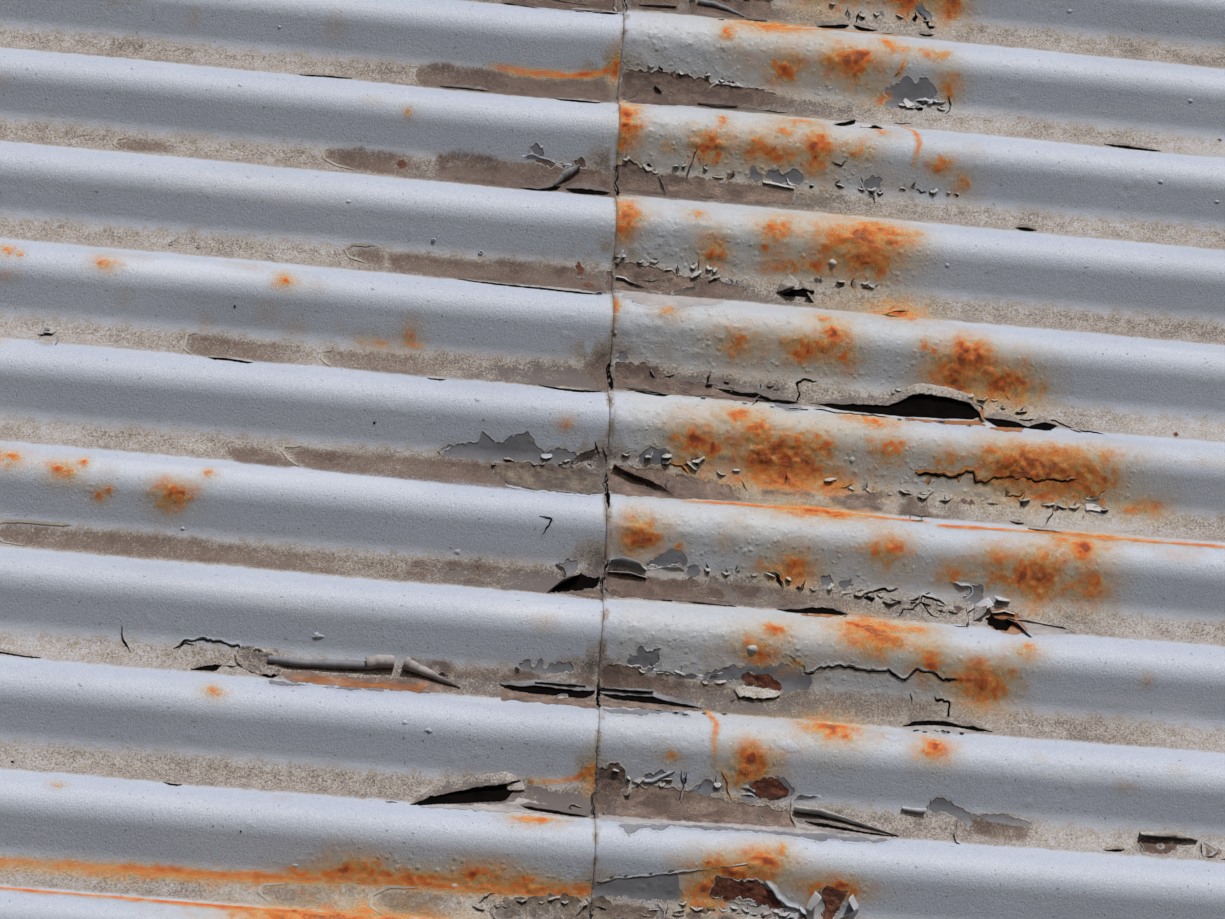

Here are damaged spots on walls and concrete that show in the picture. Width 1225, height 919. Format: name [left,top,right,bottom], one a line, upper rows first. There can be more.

rust [768,222,919,280]
peeling [538,347,1105,434]
rust [922,336,1043,402]
peeling [437,427,745,502]
rust [672,410,1225,601]
crack [904,465,1106,525]
peeling [548,545,1075,638]
peeling [261,655,461,695]
crack [790,653,958,682]
peeling [385,759,899,845]
rust [0,887,435,919]
rust [0,859,591,896]